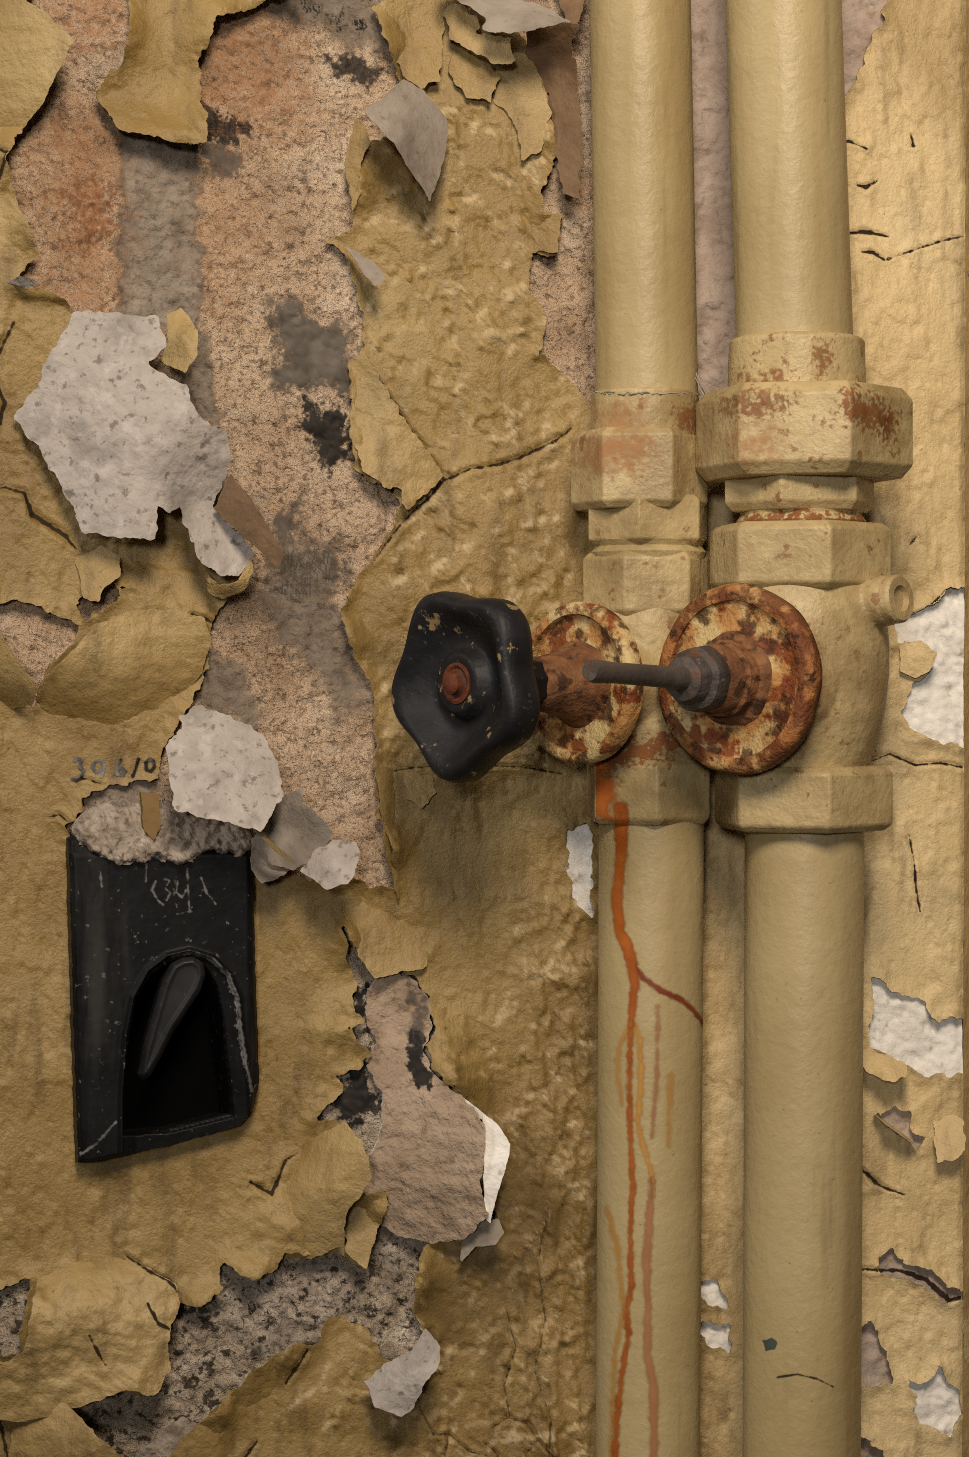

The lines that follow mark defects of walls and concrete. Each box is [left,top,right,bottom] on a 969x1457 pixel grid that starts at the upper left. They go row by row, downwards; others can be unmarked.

crack [846,140,877,189]
crack [850,230,960,261]
rust [718,336,834,418]
rust [829,384,902,443]
crack [0,486,76,548]
rust [742,508,866,522]
peeling [895,587,965,748]
peeling [0,0,596,1457]
peeling [863,977,963,1082]
rust [595,725,703,1457]
crack [862,1268,961,1302]
peeling [861,1321,962,1437]